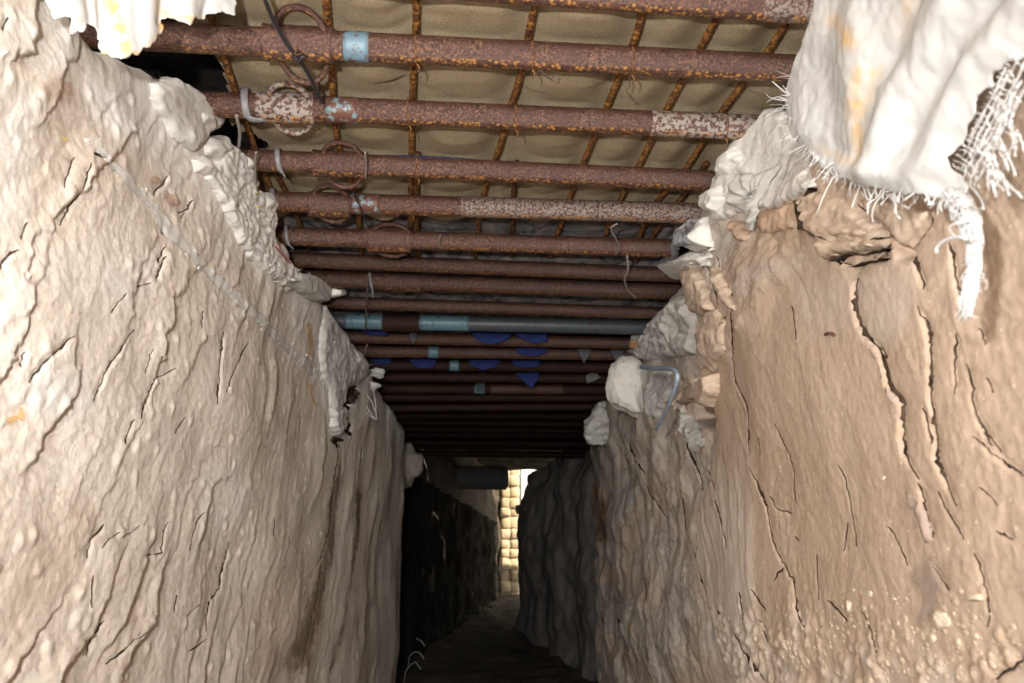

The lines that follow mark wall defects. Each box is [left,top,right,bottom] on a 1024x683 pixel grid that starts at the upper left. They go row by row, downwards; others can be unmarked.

crack [60,152,116,225]
crack [0,222,28,269]
crack [111,200,193,313]
crack [19,335,77,383]
crack [93,330,134,401]
crack [124,348,176,444]
crack [201,311,249,405]
spalling [867,343,898,405]
crack [793,188,1024,627]
crack [707,256,877,680]
spalling [906,491,934,543]
crack [86,521,169,664]